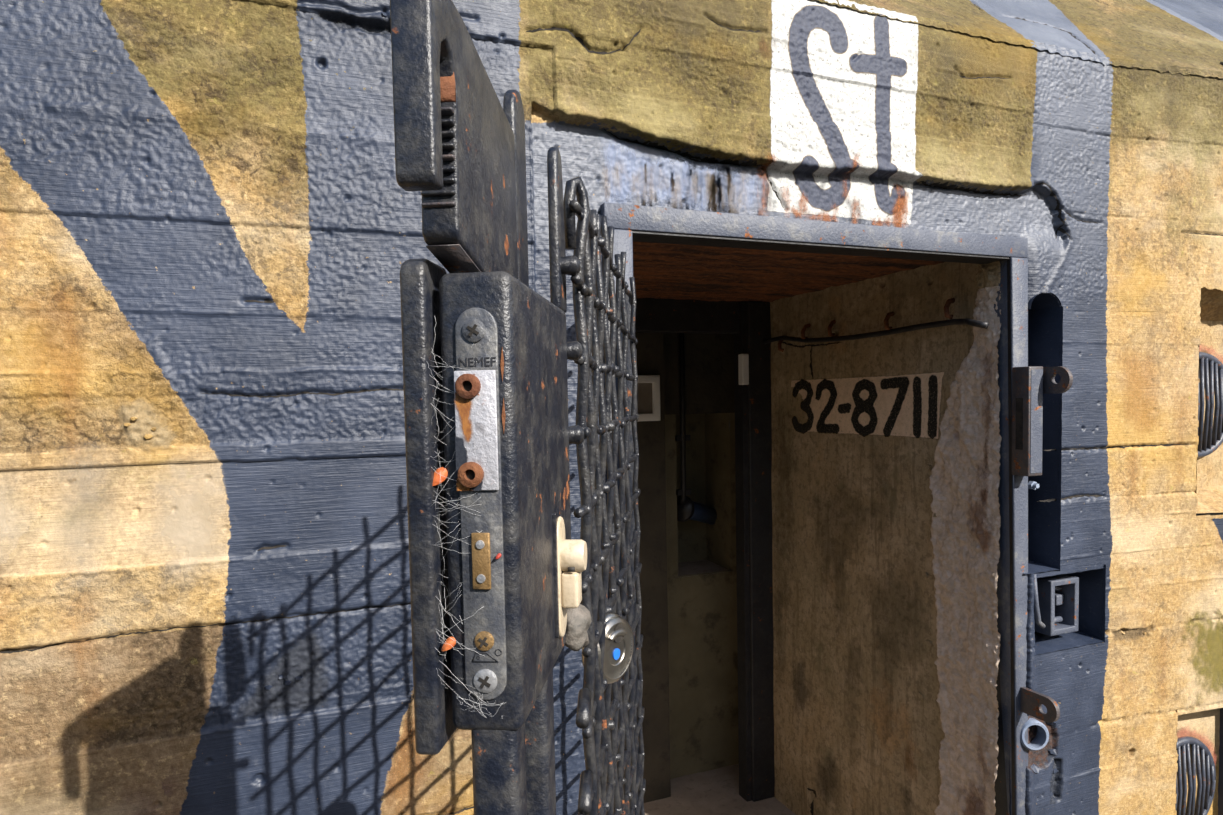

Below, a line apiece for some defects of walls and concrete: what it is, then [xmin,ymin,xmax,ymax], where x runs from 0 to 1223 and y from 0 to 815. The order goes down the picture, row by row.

crack [526,27,641,54]
corrosion [872,197,907,227]